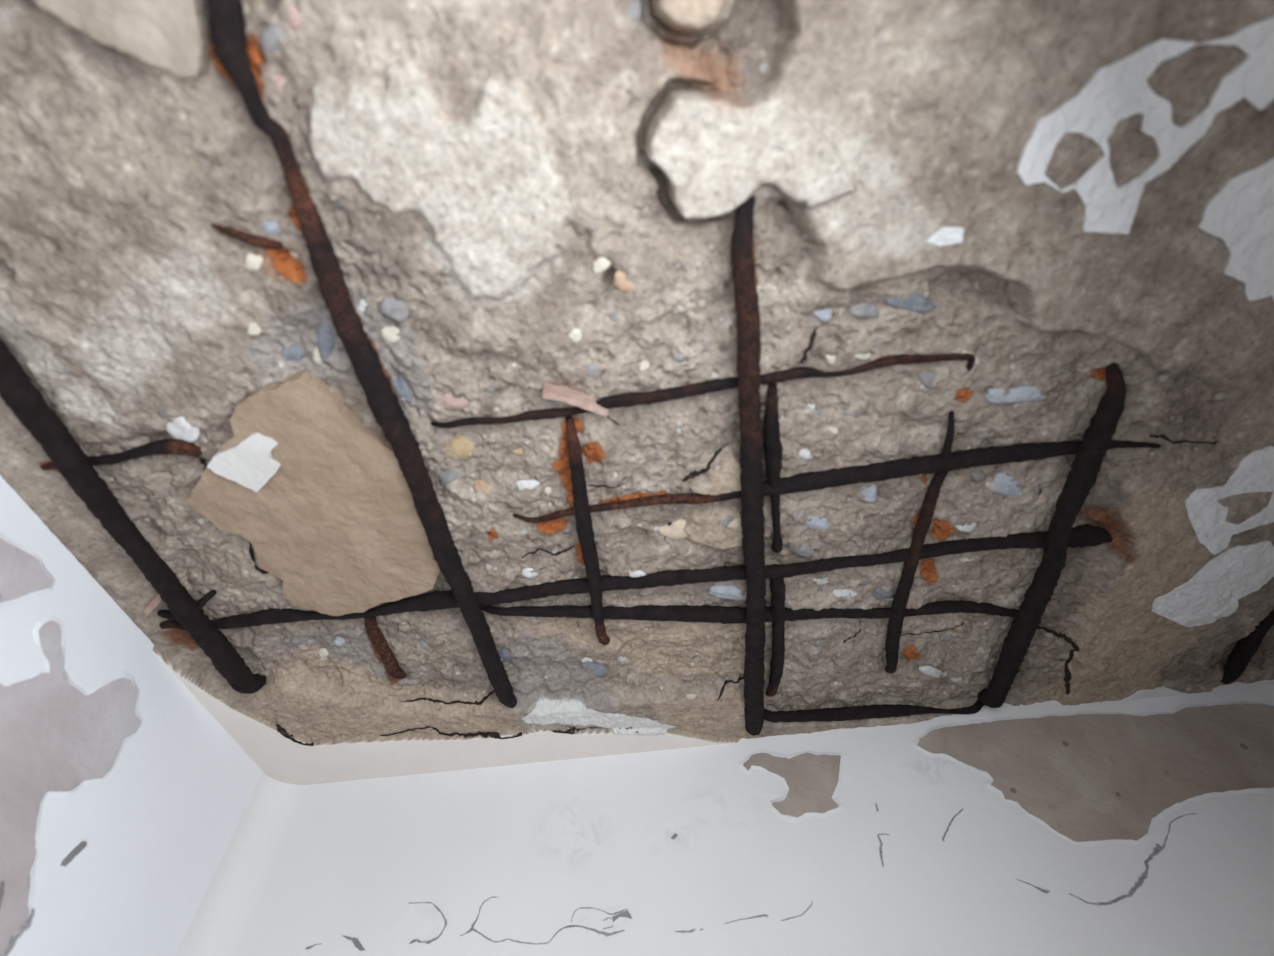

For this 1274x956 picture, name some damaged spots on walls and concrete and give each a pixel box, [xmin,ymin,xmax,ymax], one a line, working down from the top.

peeling [1017,17,1274,234]
corrosion [266,249,306,283]
spalling [0,0,1179,745]
corrosion [955,388,973,402]
corrosion [535,418,605,536]
corrosion [165,629,198,650]
peeling [0,614,143,956]
crack [379,689,522,739]
crack [552,726,639,734]
peeling [913,700,1274,847]
crack [1017,813,1197,905]
crack [409,897,626,944]